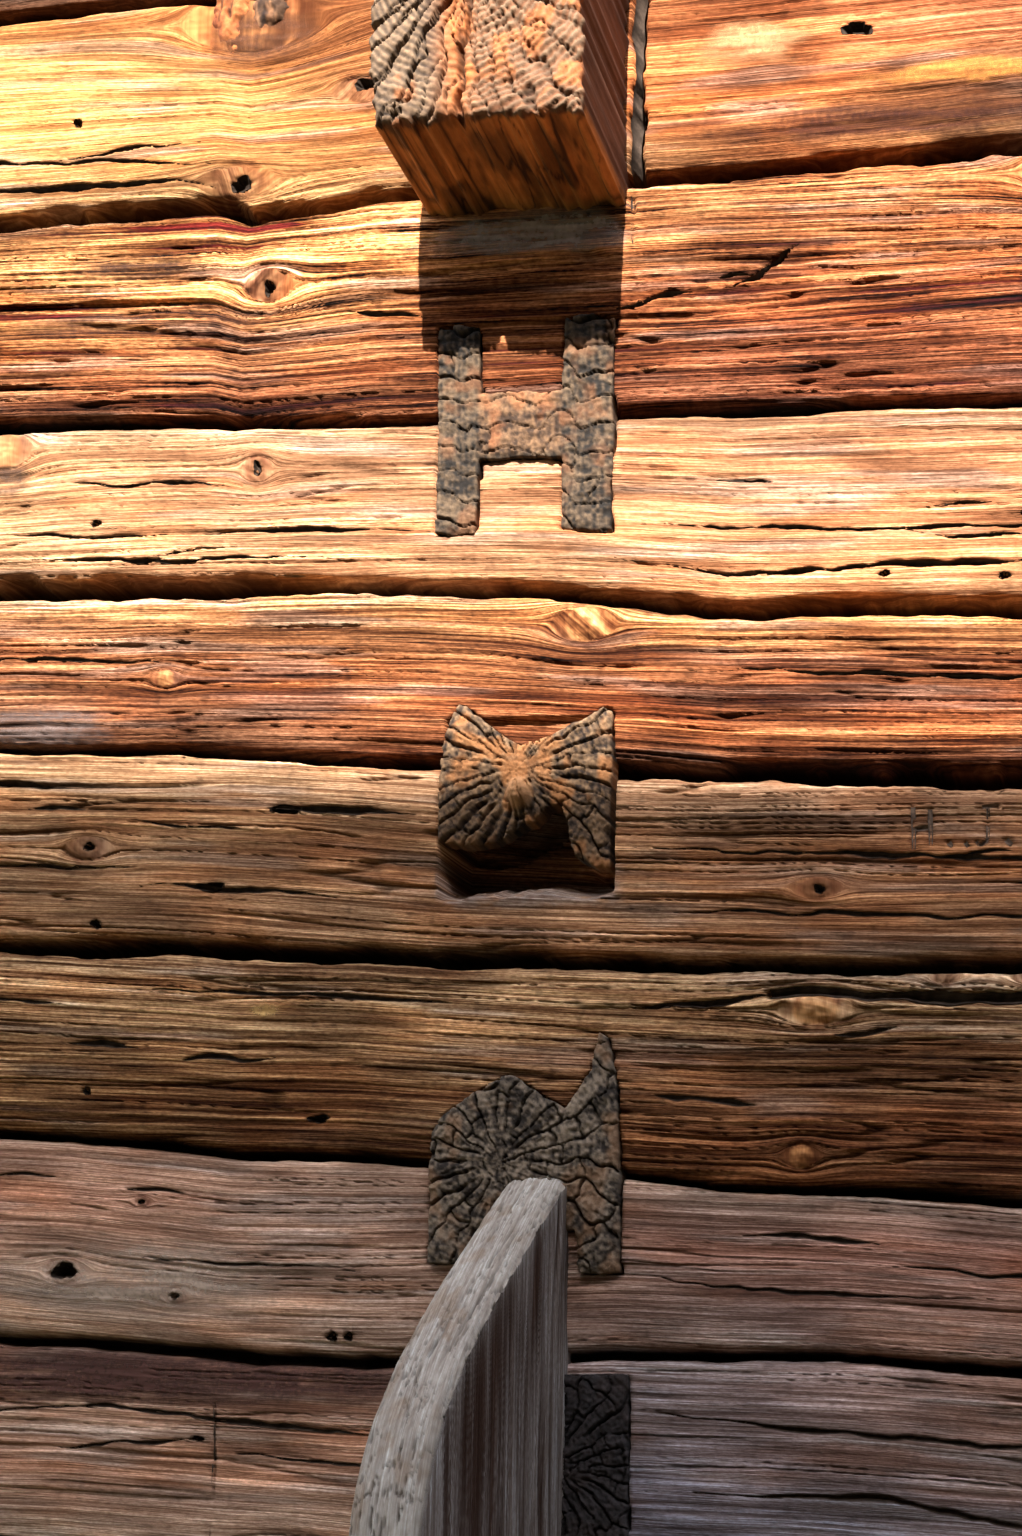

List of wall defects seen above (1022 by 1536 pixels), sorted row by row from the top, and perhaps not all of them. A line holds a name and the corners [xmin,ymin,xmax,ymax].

crack [0,143,216,193]
crack [135,806,432,829]
crack [634,1233,1022,1300]